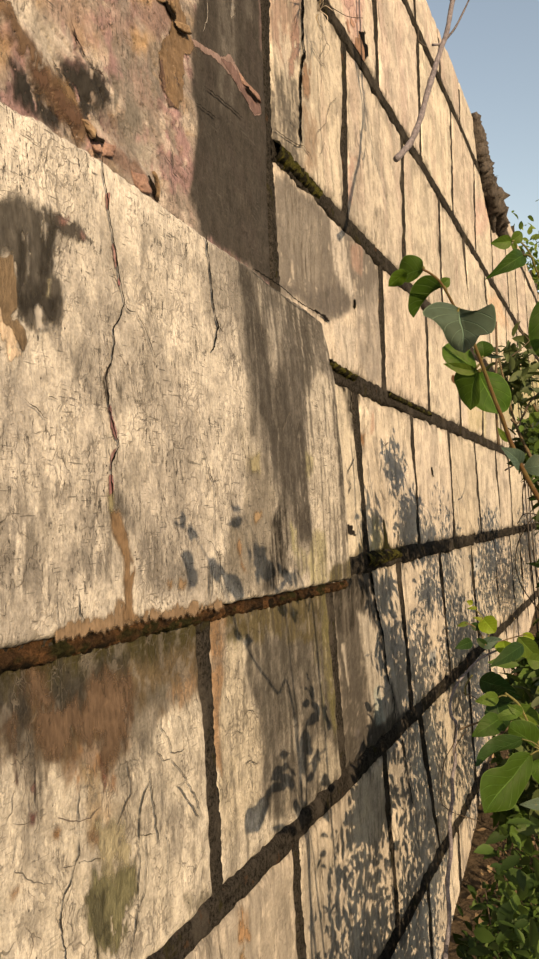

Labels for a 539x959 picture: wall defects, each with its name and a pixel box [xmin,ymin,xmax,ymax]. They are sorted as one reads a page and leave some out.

leakage [9,57,66,134]
leakage [54,54,111,121]
spalling [81,119,116,157]
spalling [131,170,161,202]
peeling [157,0,262,116]
peeling [0,254,27,362]
leakage [0,193,88,330]
crack [101,151,157,497]
crack [206,235,224,351]
crack [7,762,102,959]
crack [117,709,202,959]